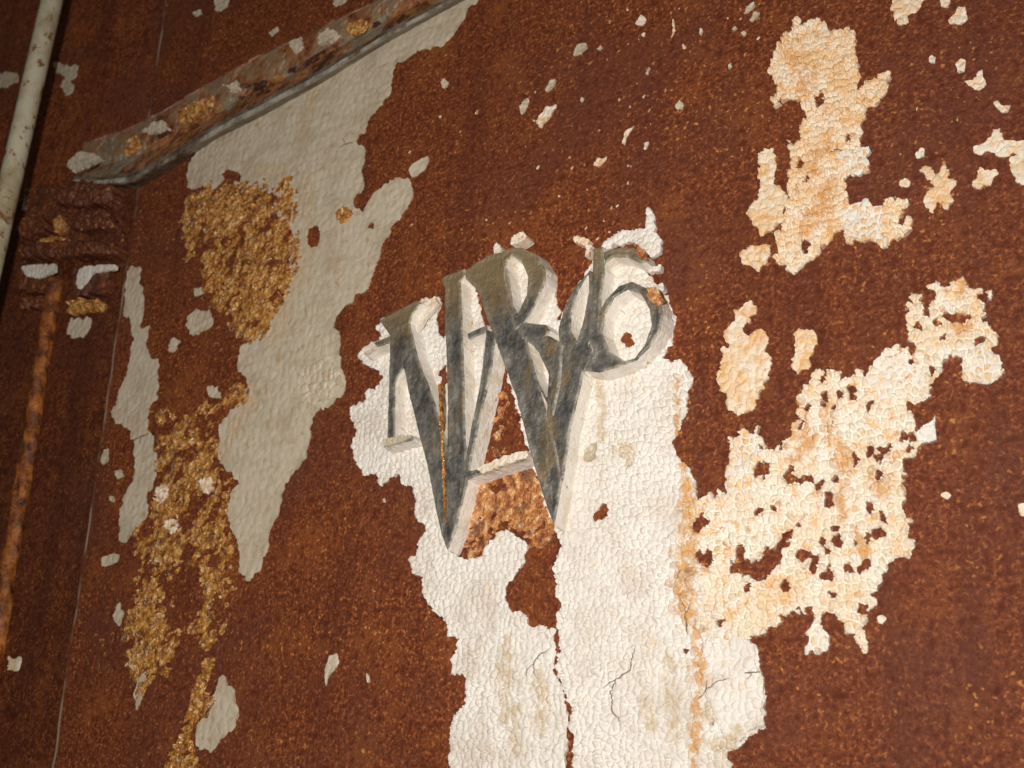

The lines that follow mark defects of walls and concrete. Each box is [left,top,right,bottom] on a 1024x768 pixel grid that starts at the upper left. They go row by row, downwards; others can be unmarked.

rust [0,277,63,678]
peeling [76,264,160,567]
rust [121,381,250,768]
peeling [195,675,239,753]
rust [178,175,302,345]
peeling [186,0,478,582]
rust [464,469,556,559]
crack [603,646,636,721]
peeling [349,205,1006,768]
rust [670,462,714,768]
peeling [728,16,913,275]
peeling [955,58,987,91]